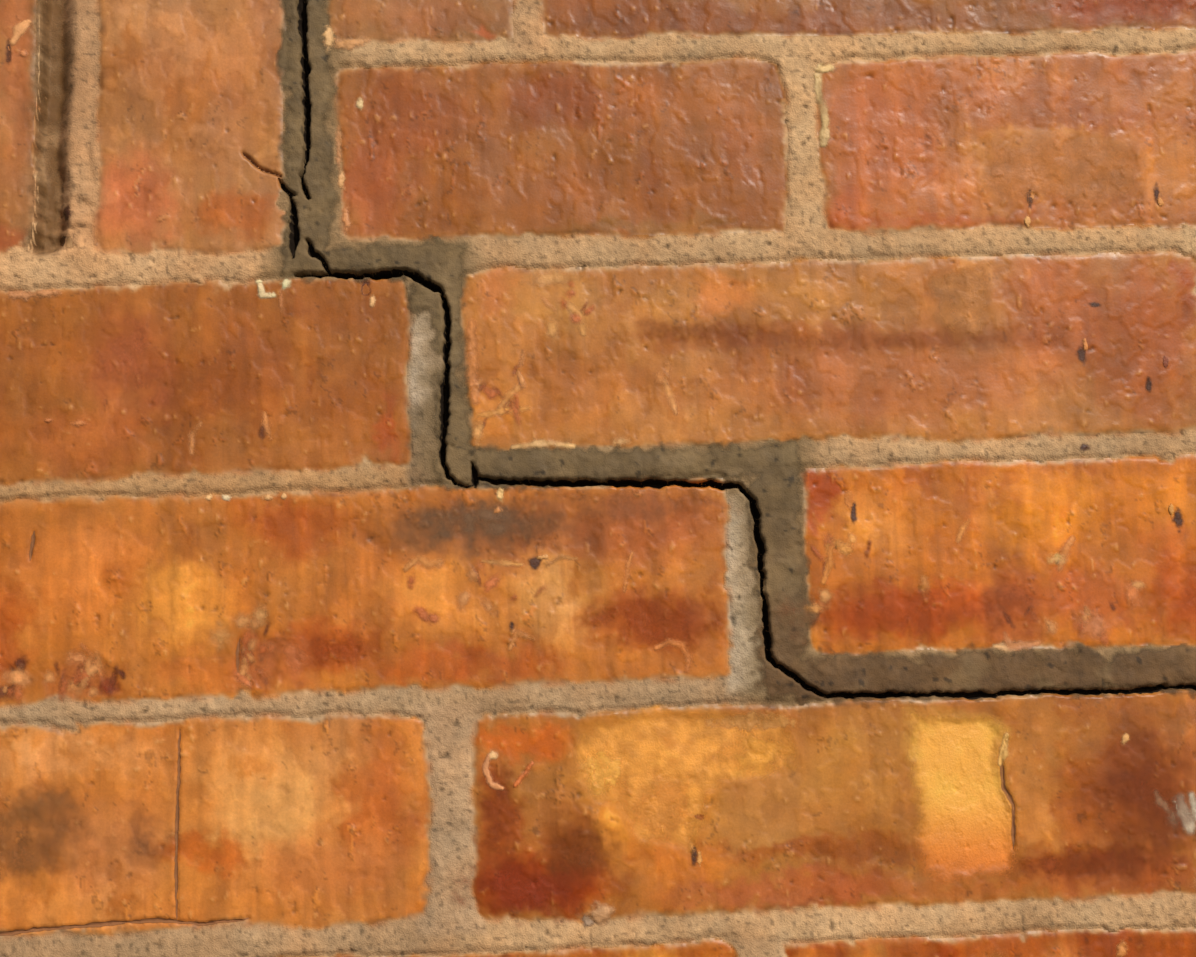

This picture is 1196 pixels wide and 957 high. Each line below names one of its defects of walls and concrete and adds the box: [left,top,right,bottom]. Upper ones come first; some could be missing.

crack [243,0,1196,700]
crack [0,732,249,936]
crack [1000,762,1016,849]